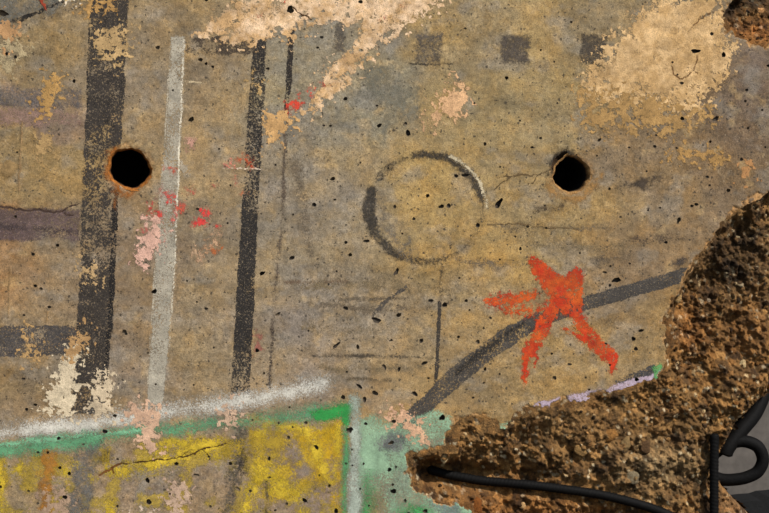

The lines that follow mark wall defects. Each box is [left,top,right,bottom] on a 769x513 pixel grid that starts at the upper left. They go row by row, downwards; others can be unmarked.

peeling [191,0,452,157]
peeling [404,71,477,136]
peeling [570,0,769,192]
spalling [364,192,769,513]
crack [100,444,223,475]